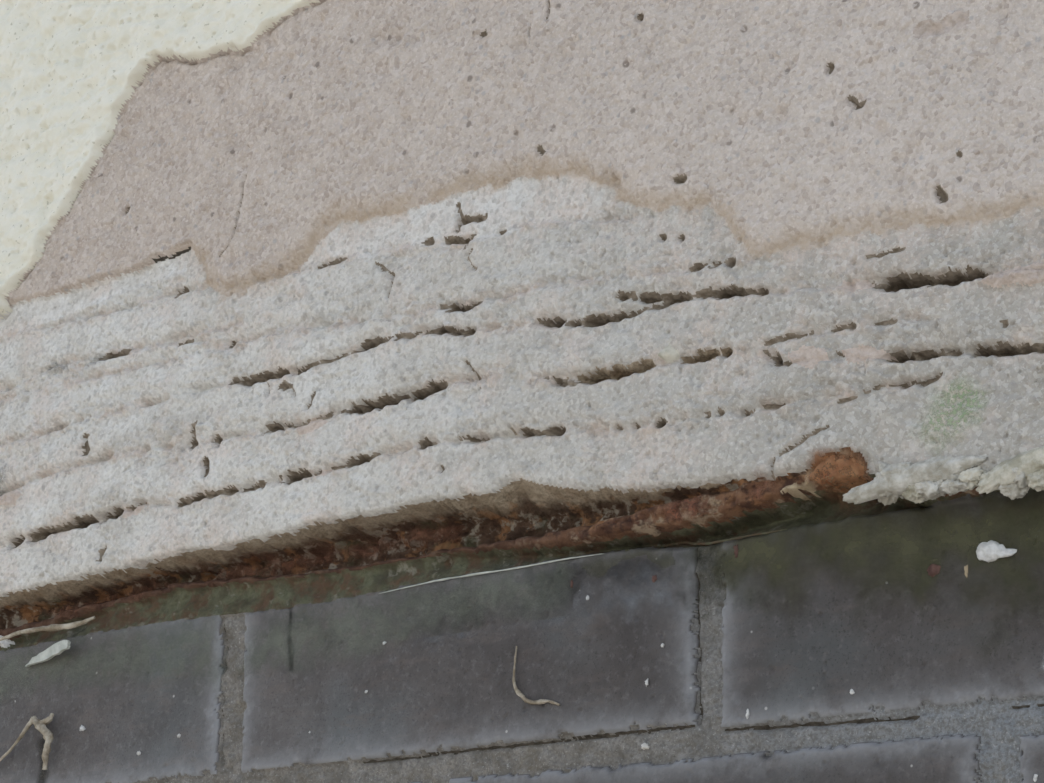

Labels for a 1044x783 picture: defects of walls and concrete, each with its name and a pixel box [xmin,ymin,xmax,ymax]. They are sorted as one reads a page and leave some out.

spalling [913,10,971,39]
flaking render [0,174,1044,611]
rust [808,452,868,494]
water stain [705,446,1044,595]